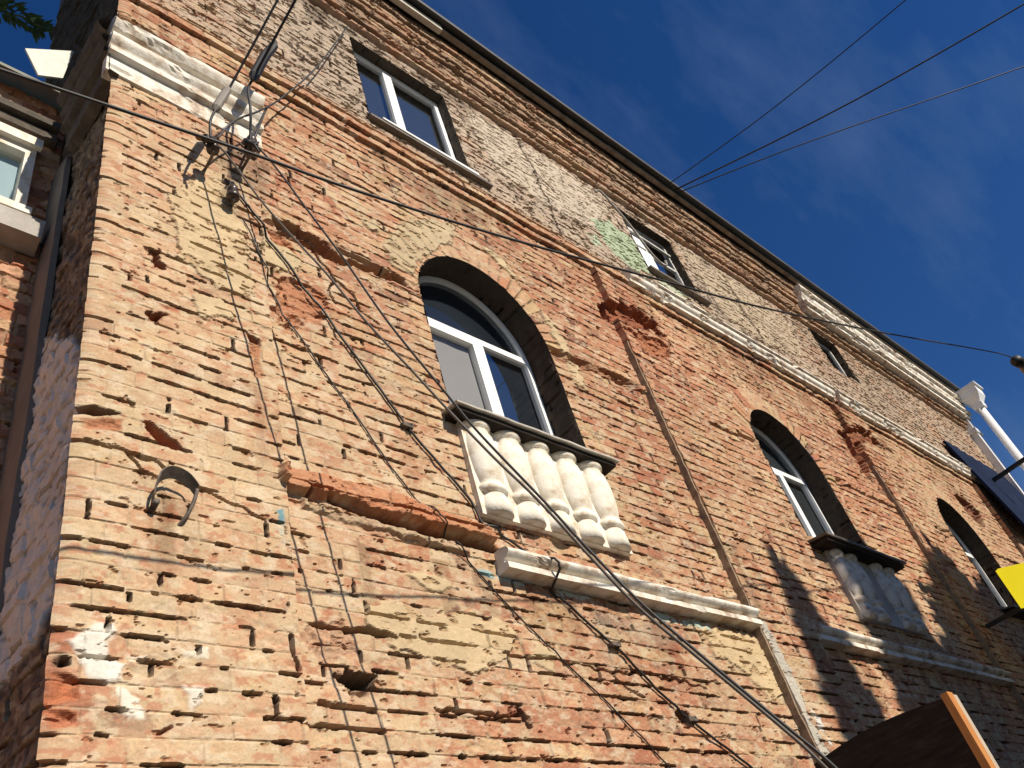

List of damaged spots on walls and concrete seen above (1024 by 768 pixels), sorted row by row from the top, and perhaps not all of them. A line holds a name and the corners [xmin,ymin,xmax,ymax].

spalling [597,298,673,359]
spalling [837,424,893,483]
peeling [41,622,148,730]
peeling [181,646,210,660]
spalling [300,620,378,702]